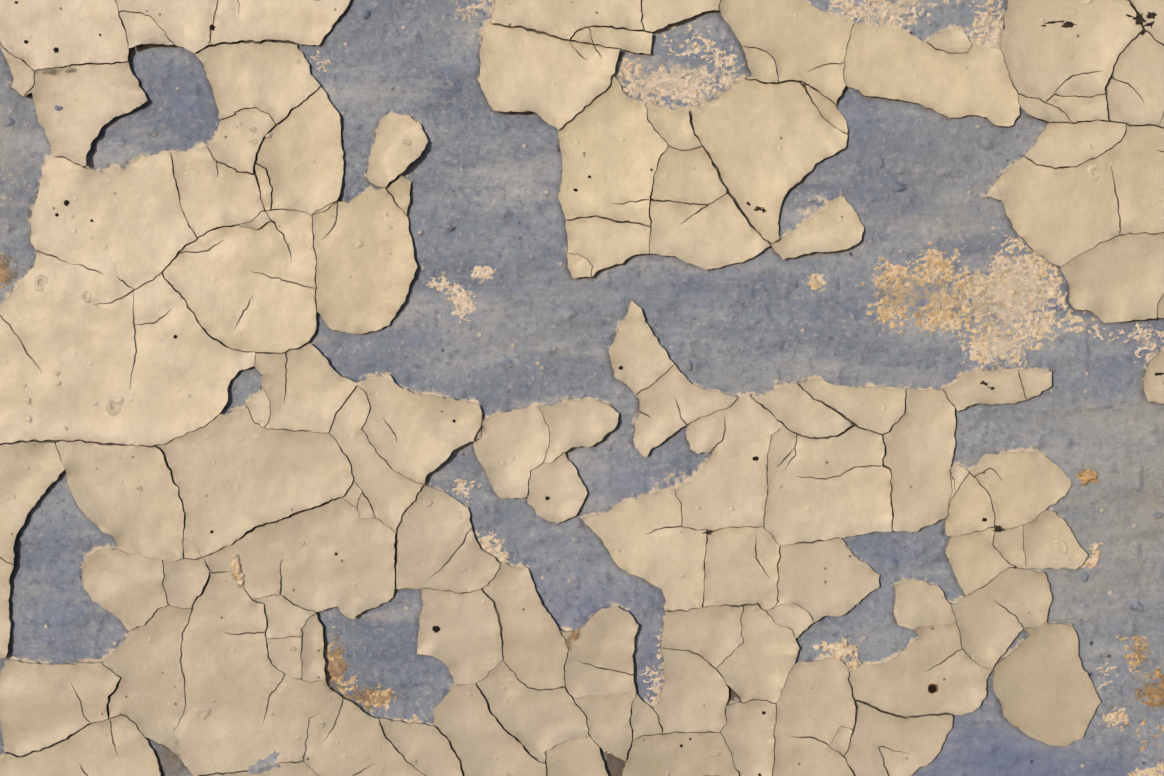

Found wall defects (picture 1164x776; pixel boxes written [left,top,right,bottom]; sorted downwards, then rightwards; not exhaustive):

crack [0,0,297,98]
crack [491,0,652,131]
crack [742,24,854,134]
crack [1001,0,1164,268]
peeling [0,0,619,776]
crack [0,85,950,776]
crack [926,468,1026,671]